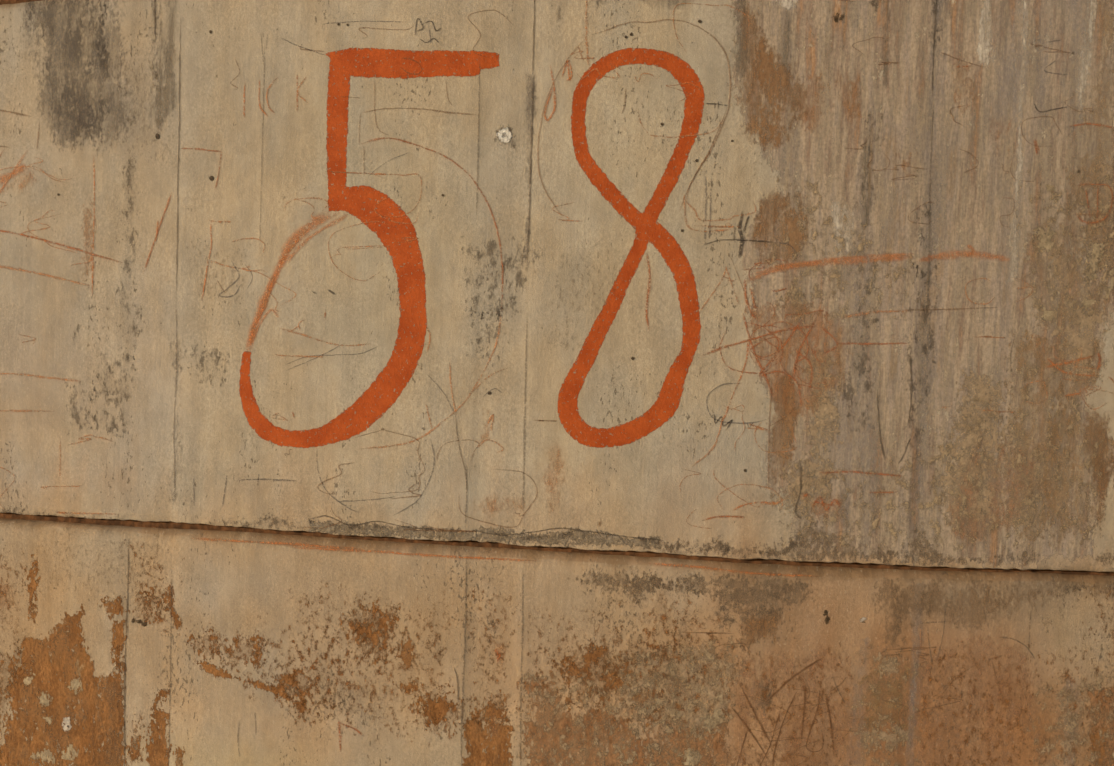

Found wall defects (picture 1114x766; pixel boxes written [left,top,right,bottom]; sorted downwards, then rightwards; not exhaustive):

water stain [25,0,128,145]
water stain [701,521,1035,565]
corrosion [339,595,418,675]
corrosion [1055,685,1114,766]